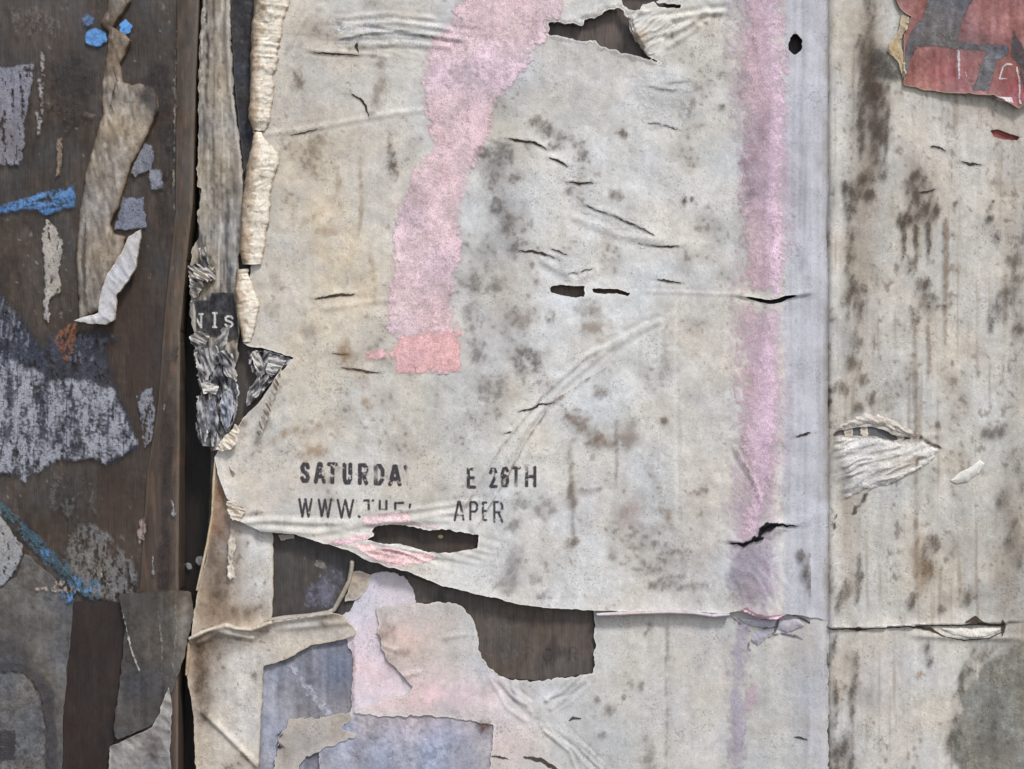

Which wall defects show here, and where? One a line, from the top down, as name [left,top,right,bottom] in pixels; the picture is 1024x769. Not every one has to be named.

peeling [628,7,677,55]
water stain [843,0,898,219]
water stain [841,253,867,319]
water stain [898,170,949,314]
water stain [848,355,876,410]
peeling [189,325,292,591]
peeling [185,532,784,681]